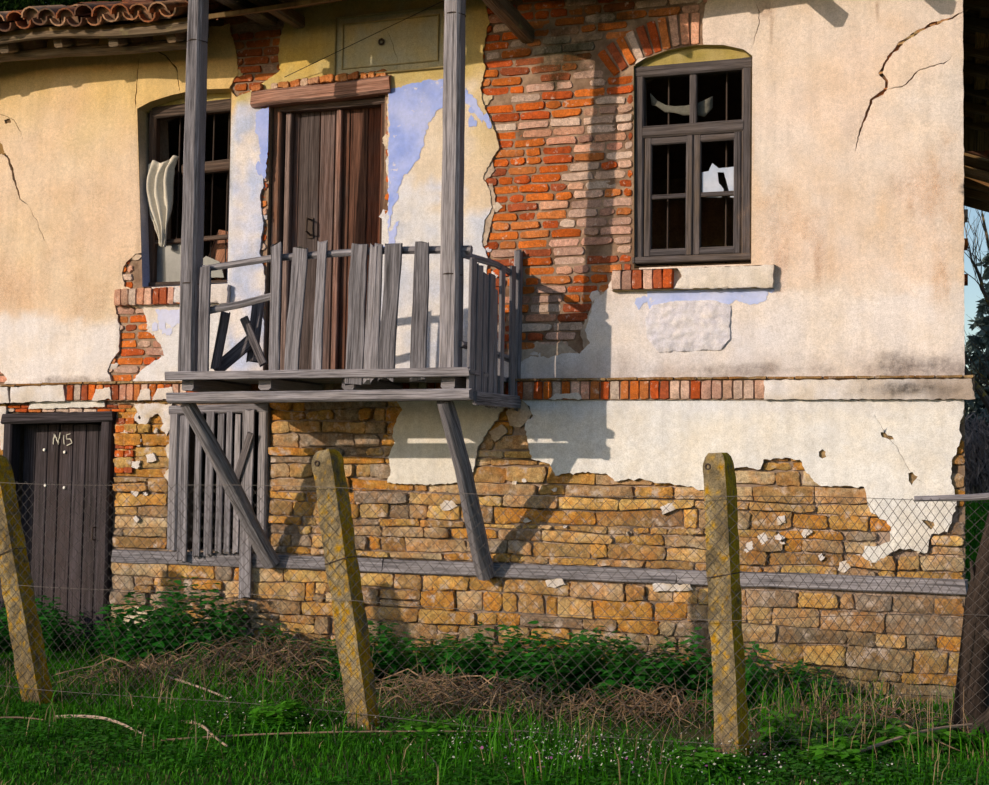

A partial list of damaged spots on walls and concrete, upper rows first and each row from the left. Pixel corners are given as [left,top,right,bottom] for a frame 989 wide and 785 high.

crack [0,115,14,171]
flaking render [217,10,285,97]
peeling [379,79,443,247]
flaking render [465,0,707,361]
crack [856,11,966,147]
flaking render [122,253,146,289]
peeling [0,403,8,455]
peeling [67,305,192,549]
peeling [268,401,473,561]
peeling [473,380,765,571]
peeling [735,458,965,579]
peeling [950,440,965,506]